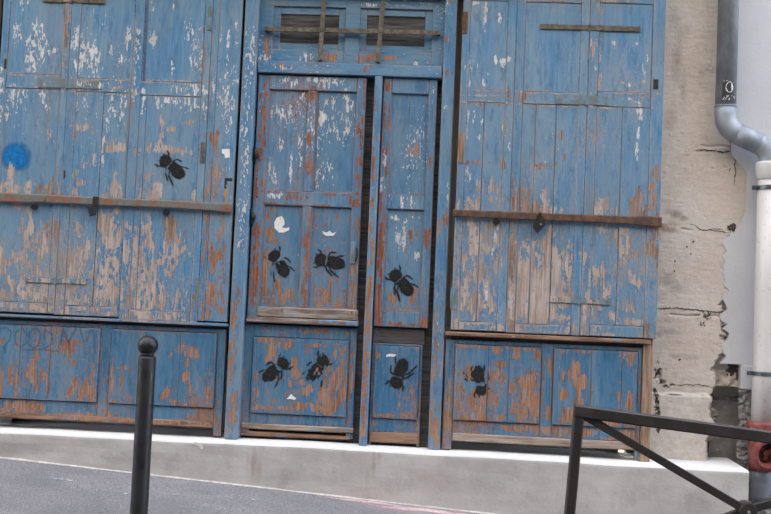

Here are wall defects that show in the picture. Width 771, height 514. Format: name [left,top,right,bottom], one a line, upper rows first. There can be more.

peeling [0,0,660,449]
crack [658,306,723,314]
flaking render [725,364,739,381]